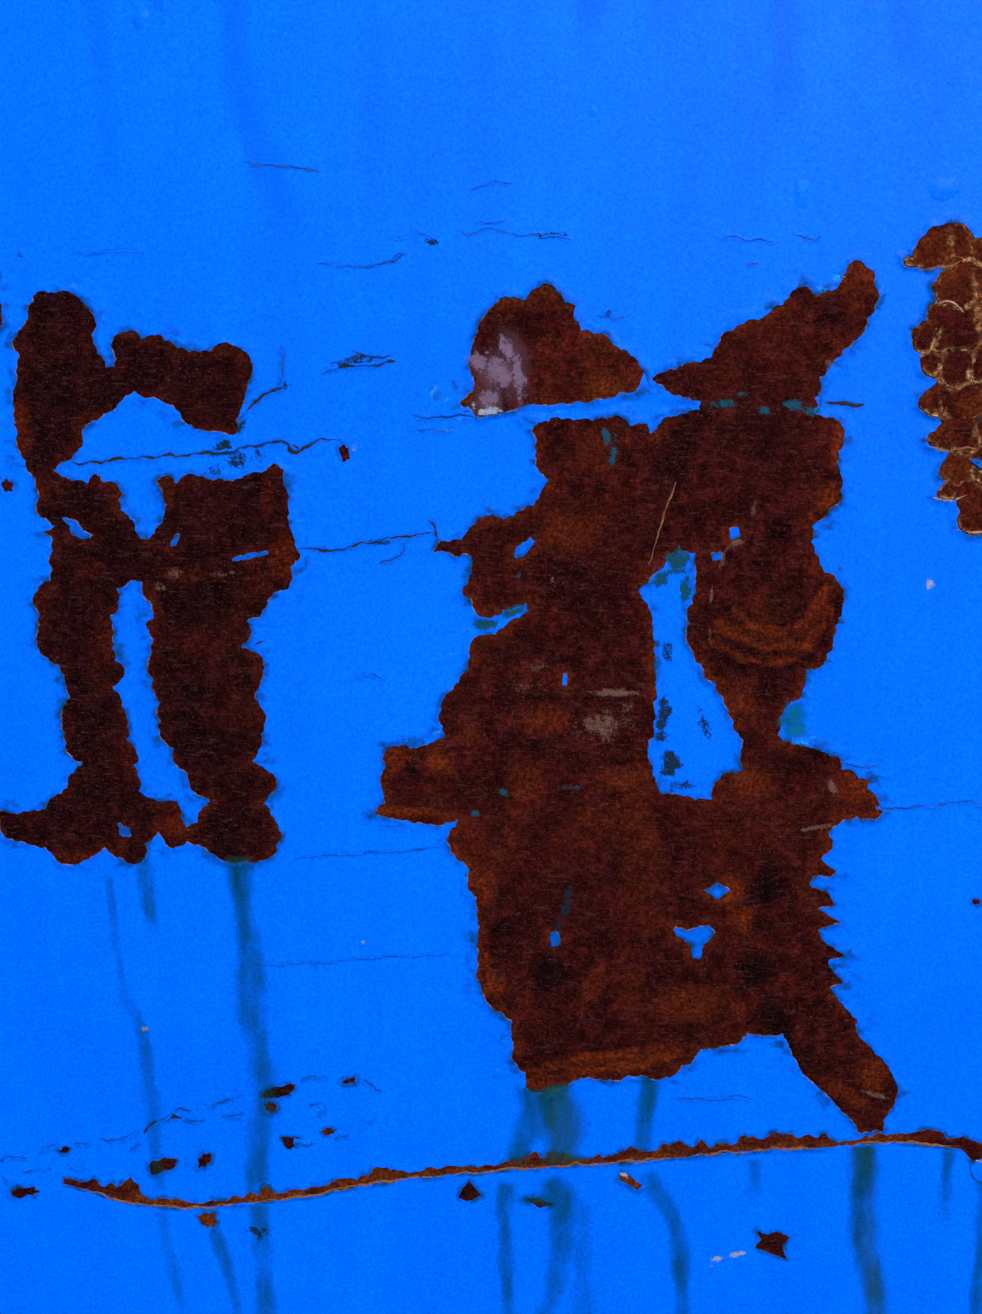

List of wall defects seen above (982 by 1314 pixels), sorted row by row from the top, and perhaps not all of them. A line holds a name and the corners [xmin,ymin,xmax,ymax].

peeling [336,1071,361,1089]
peeling [257,1080,300,1119]
rust [642,1081,655,1118]
peeling [53,1139,74,1157]
peeling [144,1147,216,1180]
peeling [278,1125,339,1150]
rust [526,1086,573,1158]
rust [860,1148,871,1181]
peeling [5,1182,43,1204]
rust [675,1258,683,1281]
rust [867,1264,882,1305]